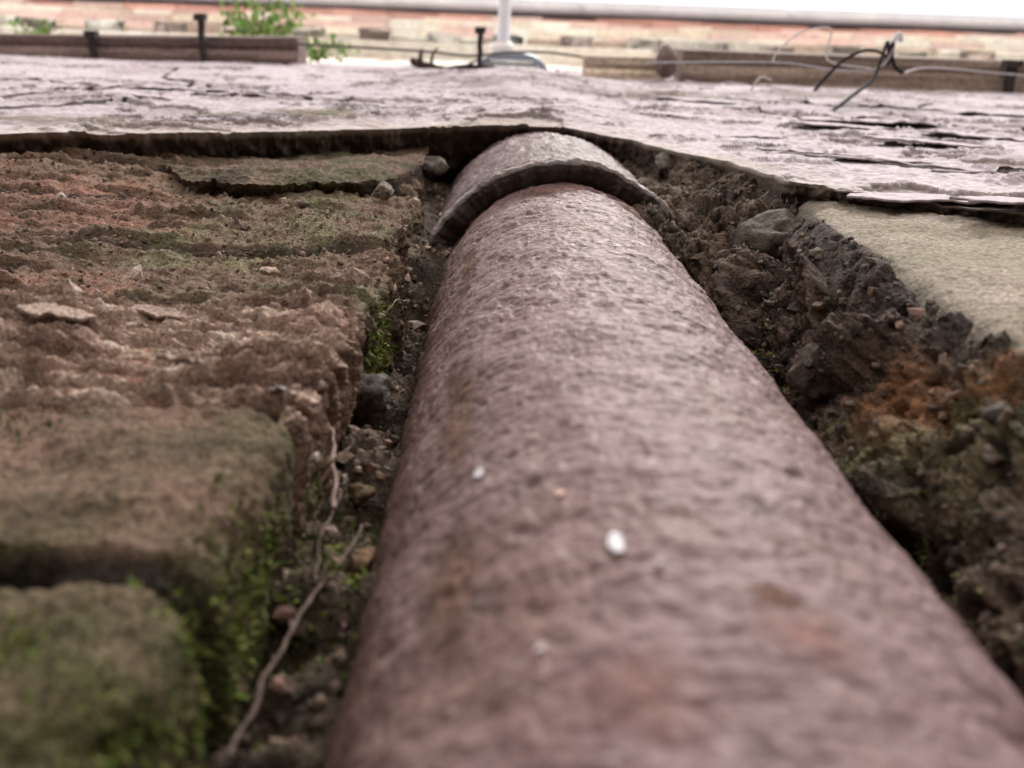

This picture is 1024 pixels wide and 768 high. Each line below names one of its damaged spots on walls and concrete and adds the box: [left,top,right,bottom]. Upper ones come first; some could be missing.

crack [706,97,1024,132]
crack [755,147,1024,173]